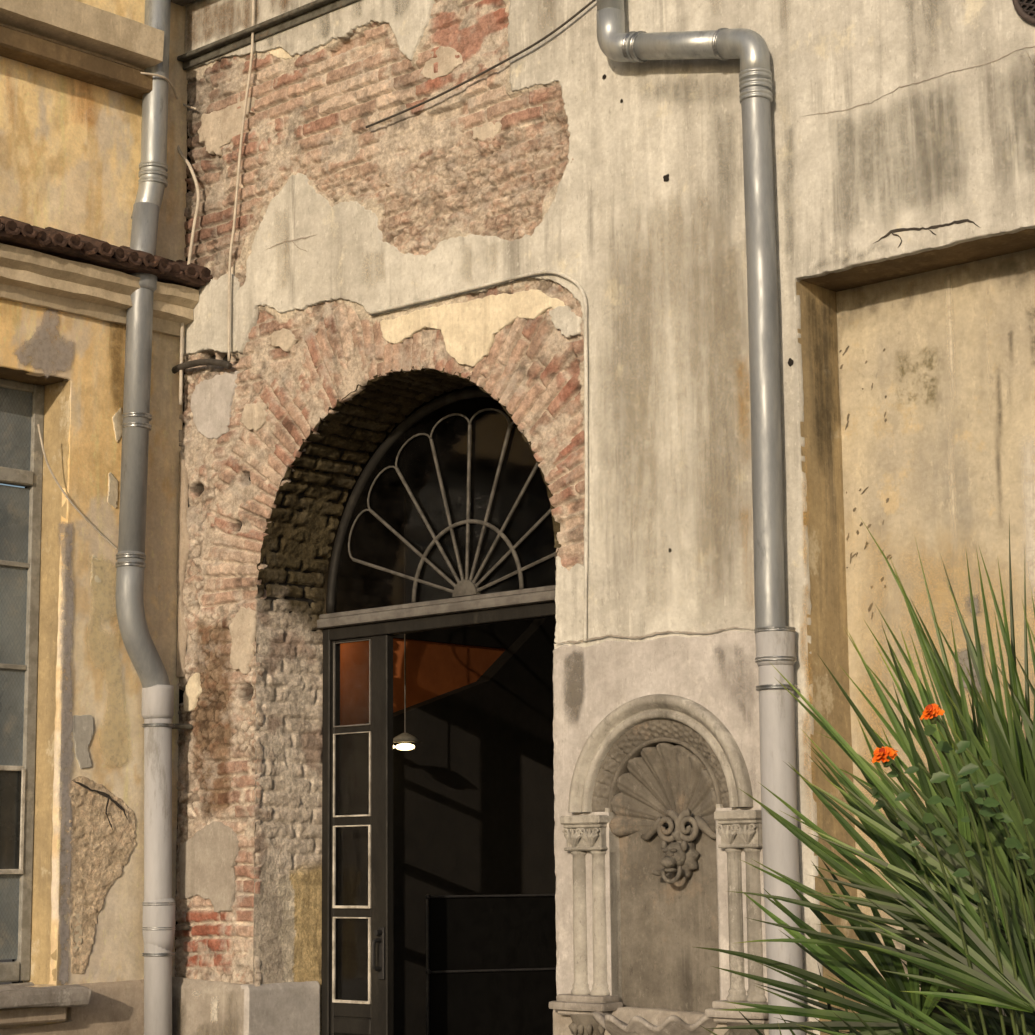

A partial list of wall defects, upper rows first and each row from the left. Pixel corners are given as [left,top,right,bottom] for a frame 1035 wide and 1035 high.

crack [806,46,1035,116]
flaking render [184,0,574,287]
crack [269,235,314,252]
crack [874,219,979,247]
peeling [107,472,118,509]
flaking render [846,507,884,568]
flaking render [174,277,585,987]
flaking render [58,522,136,985]